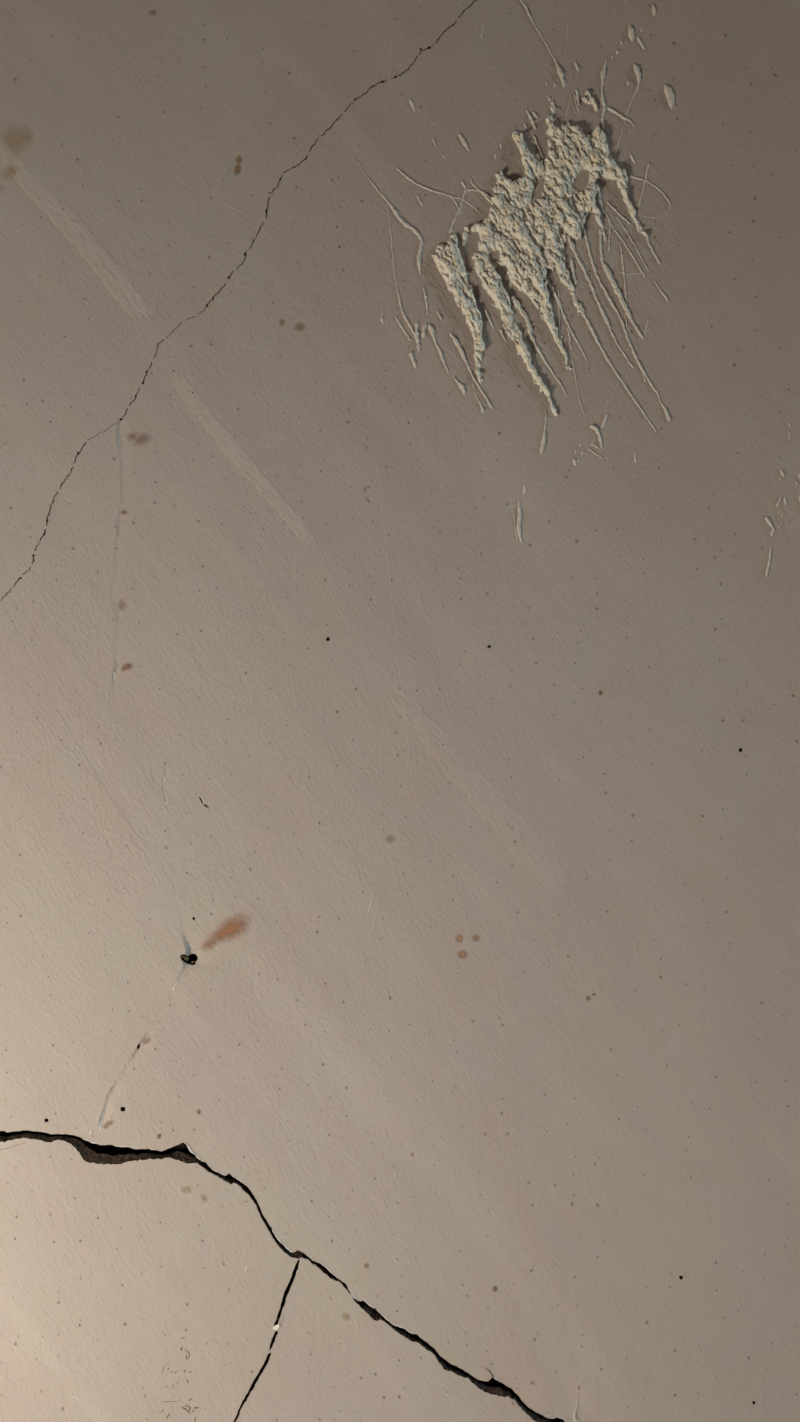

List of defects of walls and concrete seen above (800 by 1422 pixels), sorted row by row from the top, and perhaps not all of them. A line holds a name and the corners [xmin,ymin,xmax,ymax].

leakage [520,0,580,121]
leakage [601,59,641,154]
crack [0,0,477,601]
leakage [353,157,493,413]
leakage [511,163,671,460]
crack [0,1130,578,1422]